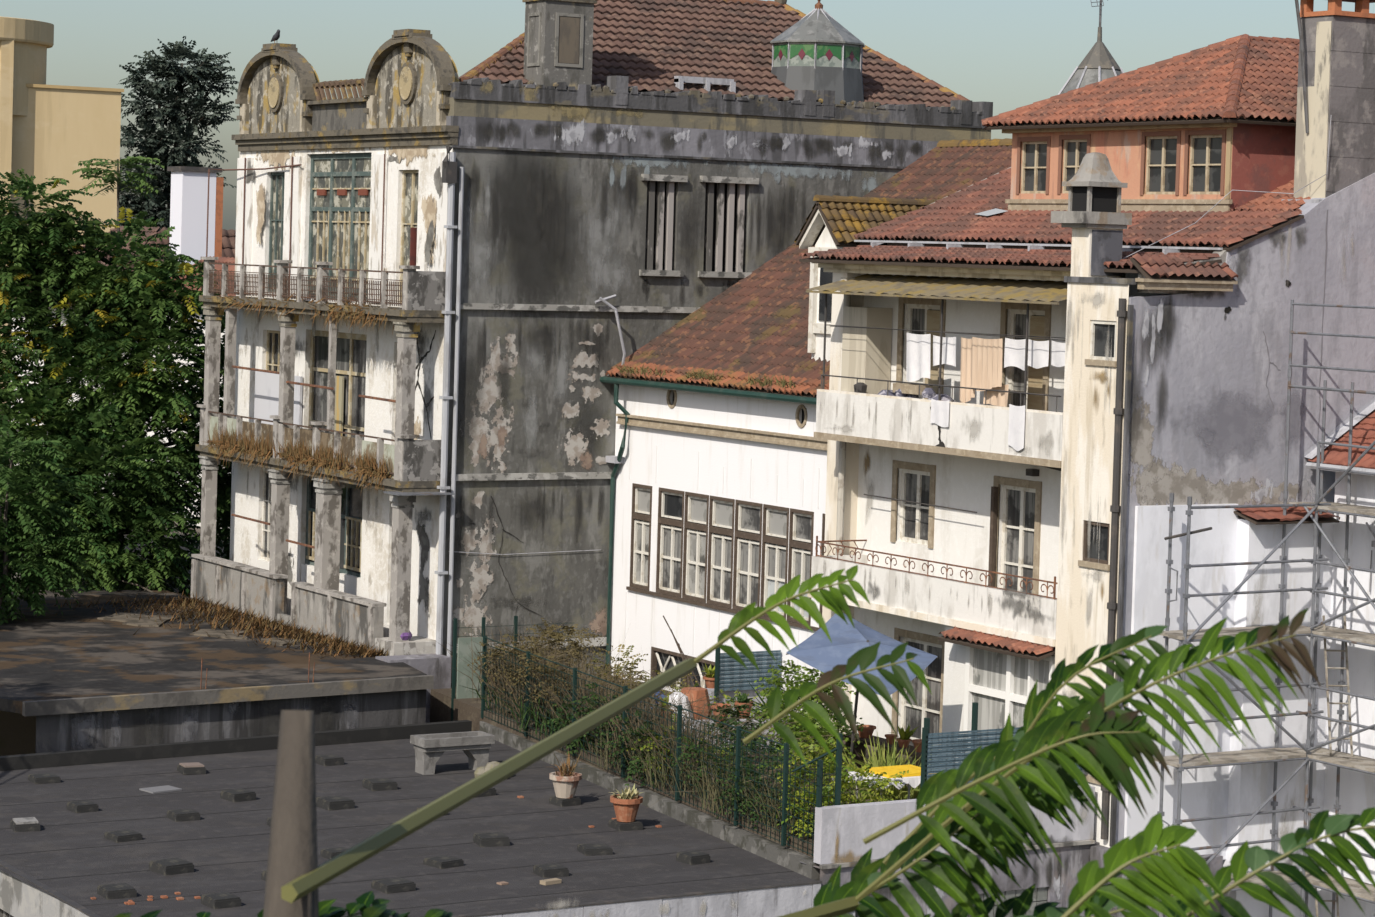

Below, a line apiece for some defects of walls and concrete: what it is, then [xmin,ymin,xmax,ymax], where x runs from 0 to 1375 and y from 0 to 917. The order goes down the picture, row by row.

peeling [460,333,520,473]
peeling [557,323,610,469]
peeling [416,510,431,617]
water stain [455,497,473,555]
peeling [452,491,498,637]
water stain [521,491,603,539]
water stain [1024,859,1068,899]